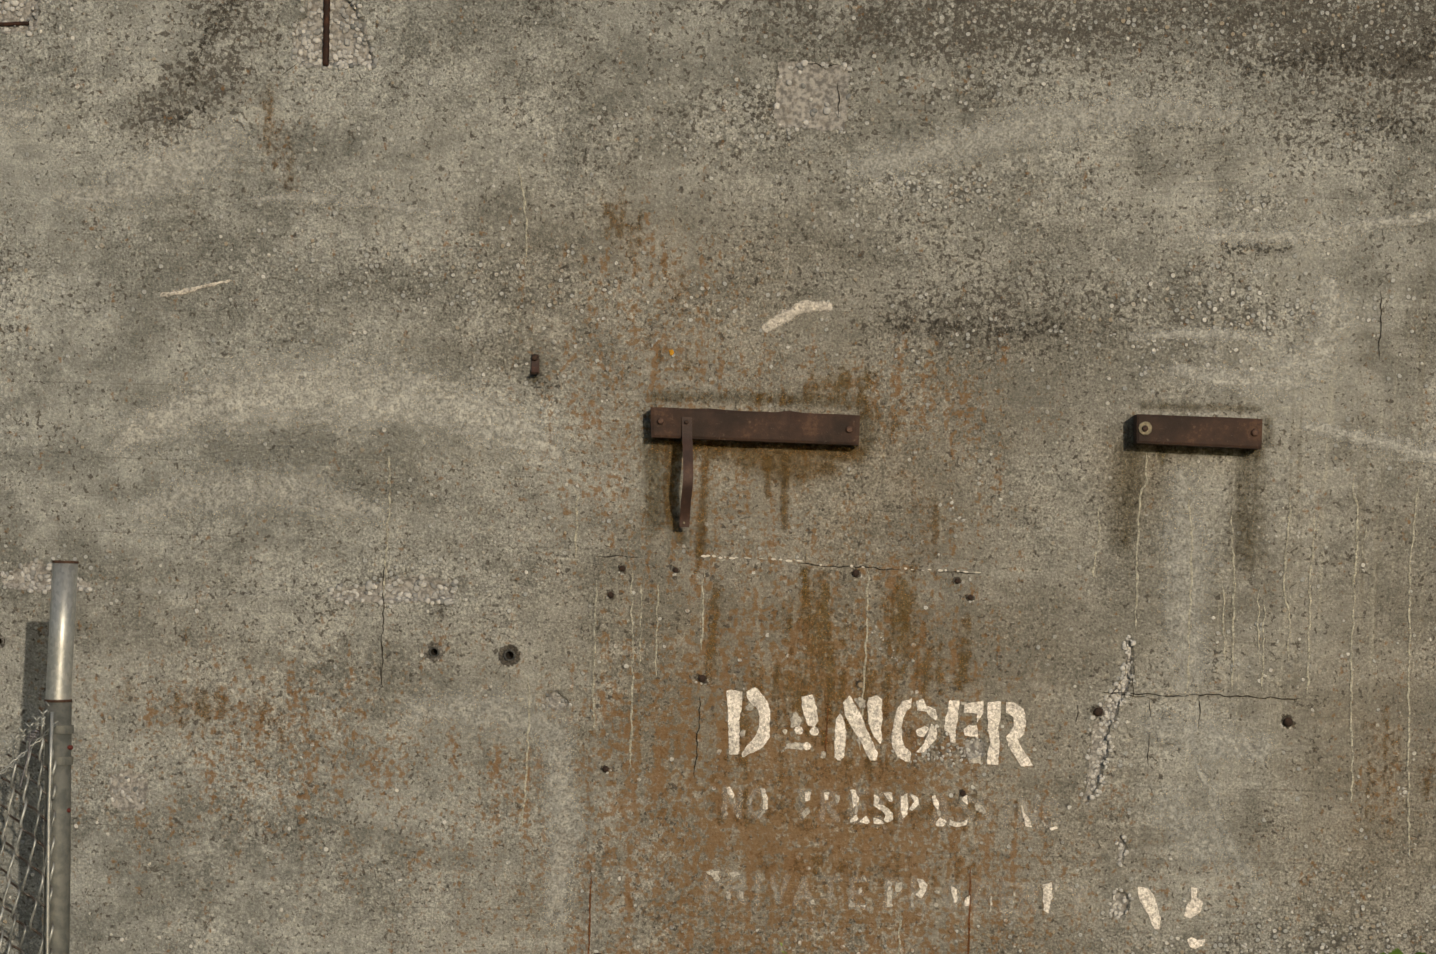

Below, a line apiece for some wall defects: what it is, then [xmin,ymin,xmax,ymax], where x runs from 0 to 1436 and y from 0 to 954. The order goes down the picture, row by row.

spalling [0,0,78,37]
spalling [291,0,378,71]
corrosion [604,203,687,296]
corrosion [756,366,898,438]
corrosion [654,442,864,572]
damp [1123,420,1164,632]
corrosion [174,687,284,743]
corrosion [717,554,972,830]
spalling [1079,635,1136,805]
corrosion [954,795,999,830]
corrosion [931,859,976,954]